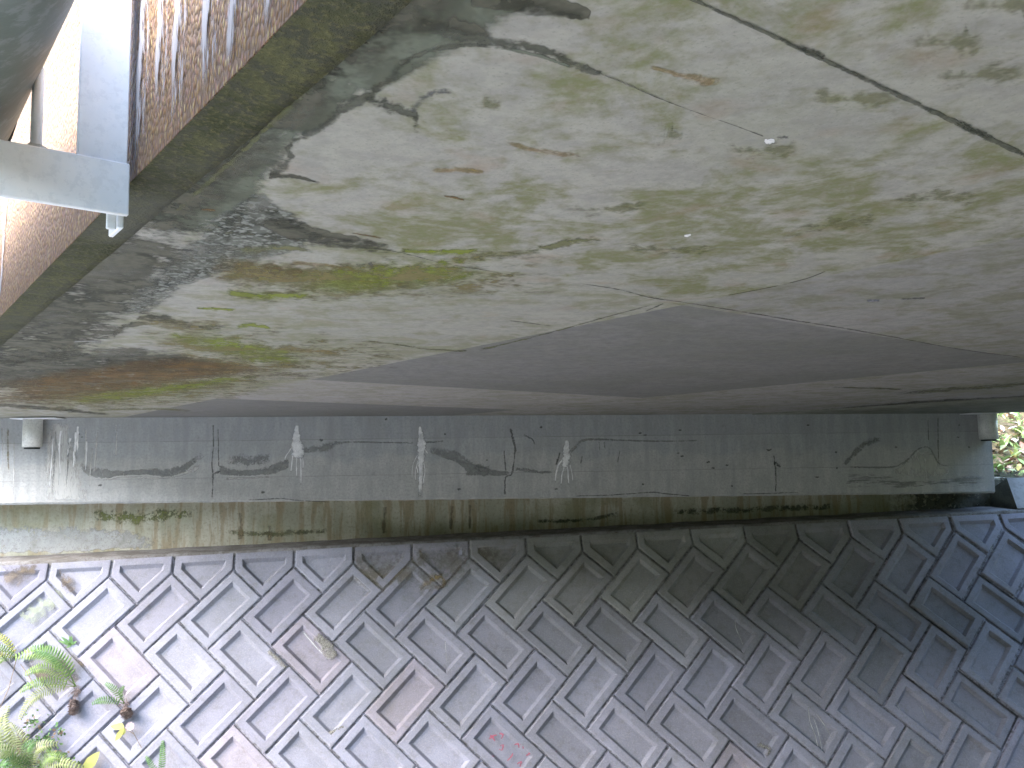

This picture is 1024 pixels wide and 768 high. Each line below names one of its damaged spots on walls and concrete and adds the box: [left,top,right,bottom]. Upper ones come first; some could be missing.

crack [690,0,1024,156]
damp [0,0,601,415]
damp [46,424,199,500]
crack [211,426,219,497]
damp [220,425,673,492]
crack [504,429,535,494]
damp [0,526,150,554]
damp [679,504,830,514]